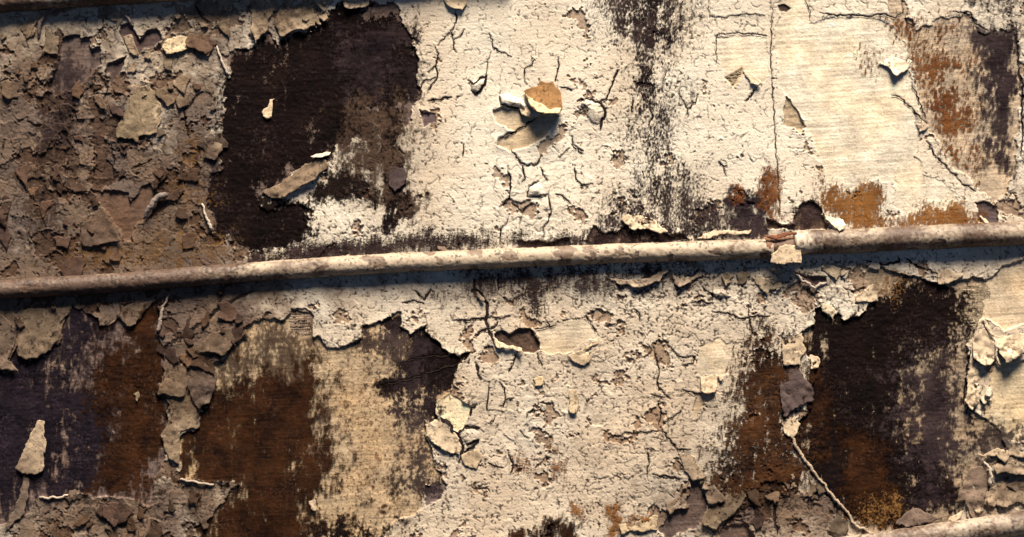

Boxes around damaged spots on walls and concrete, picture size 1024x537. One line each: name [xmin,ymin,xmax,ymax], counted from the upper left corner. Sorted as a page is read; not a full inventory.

damp [14,20,106,270]
peeling [0,0,436,252]
damp [187,0,776,262]
crack [419,11,698,238]
crack [708,0,780,211]
corrosion [729,153,789,226]
corrosion [812,5,994,229]
peeling [0,283,482,537]
damp [298,514,415,537]
crack [384,273,543,474]
crack [625,346,697,480]
peeling [610,254,1024,537]